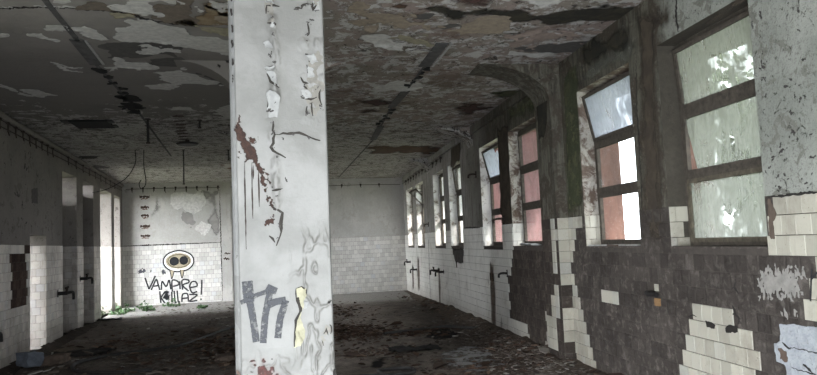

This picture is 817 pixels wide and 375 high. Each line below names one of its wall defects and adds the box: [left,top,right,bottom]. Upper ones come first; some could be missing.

peeling [26,0,234,90]
peeling [213,105,230,118]
peeling [263,0,295,140]
peeling [294,0,320,41]
peeling [369,80,423,97]
crack [269,123,320,158]
corrosion [234,115,275,236]
peeling [170,190,211,236]
crack [269,189,284,246]
peeling [9,245,30,309]
peeling [508,207,817,375]